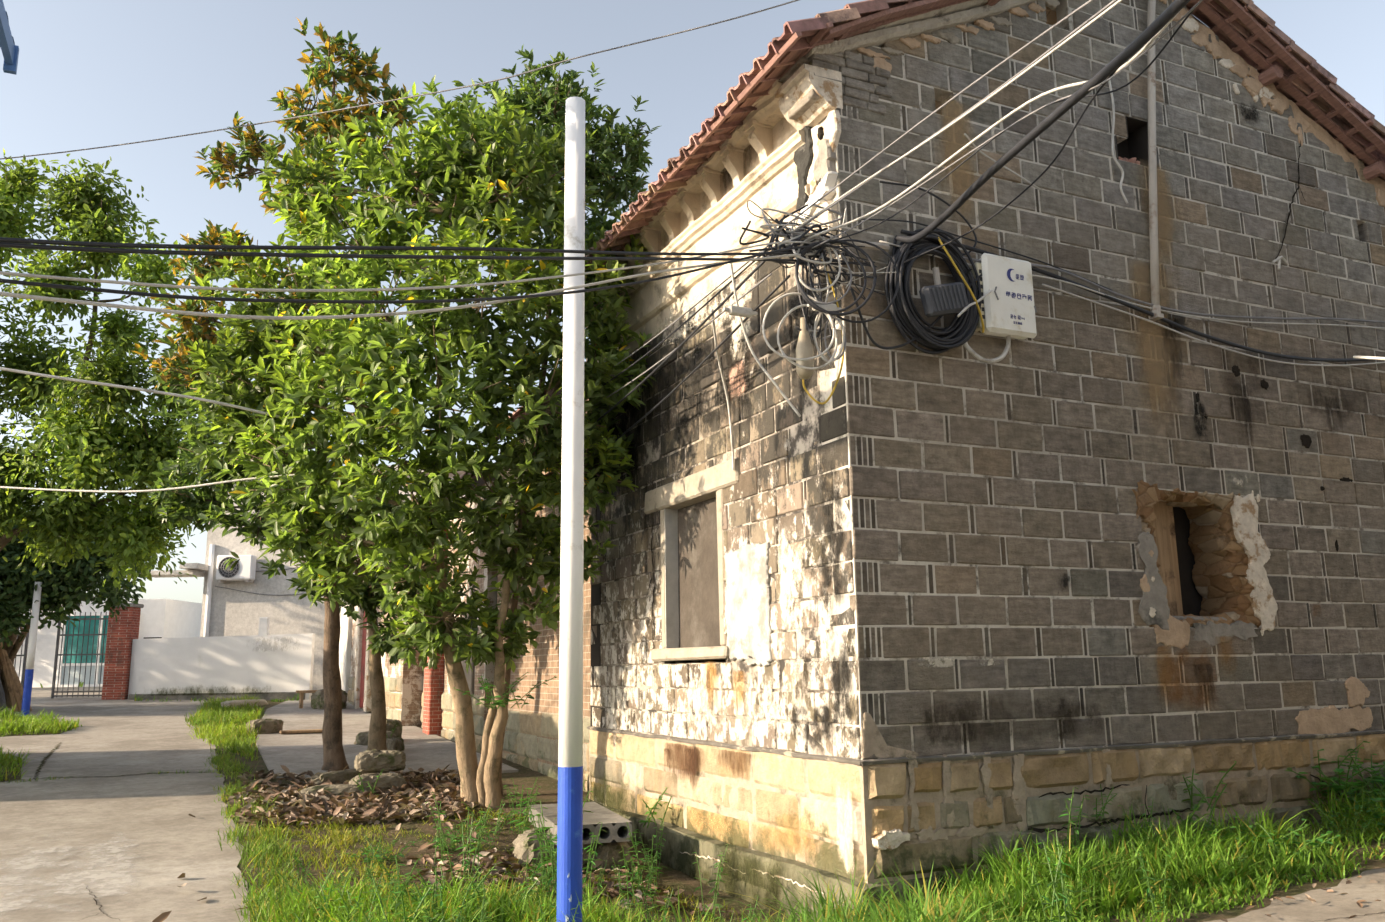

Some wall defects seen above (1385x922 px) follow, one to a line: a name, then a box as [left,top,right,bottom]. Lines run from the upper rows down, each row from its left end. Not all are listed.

spalling [1159,0,1304,146]
flaking render [793,110,841,236]
crack [1275,140,1306,259]
water stain [784,257,831,406]
water stain [610,317,755,570]
peeling [724,534,832,724]
water stain [791,643,852,743]
water stain [817,464,844,612]
spalling [1132,480,1278,649]
peeling [1295,676,1373,734]